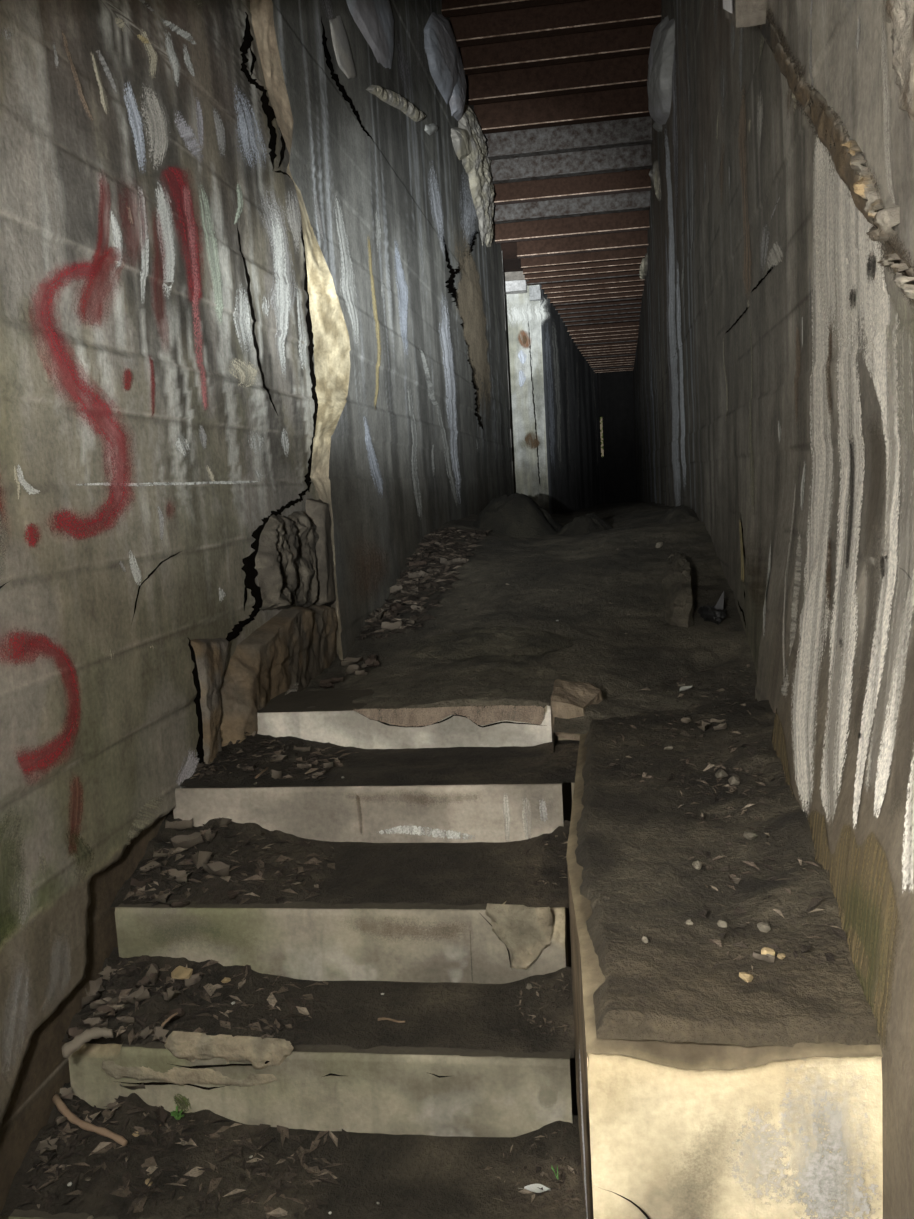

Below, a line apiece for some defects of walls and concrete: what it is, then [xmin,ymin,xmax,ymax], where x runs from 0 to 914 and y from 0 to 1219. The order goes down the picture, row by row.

crack [240,12,291,178]
spalling [757,0,914,311]
crack [726,255,781,333]
crack [226,212,318,642]
crack [187,637,204,764]
spalling [191,499,338,764]
leakage [760,135,914,1045]
spalling [484,903,553,969]
spalling [102,1031,294,1090]
leakage [579,1044,588,1219]
crack [598,1187,650,1219]